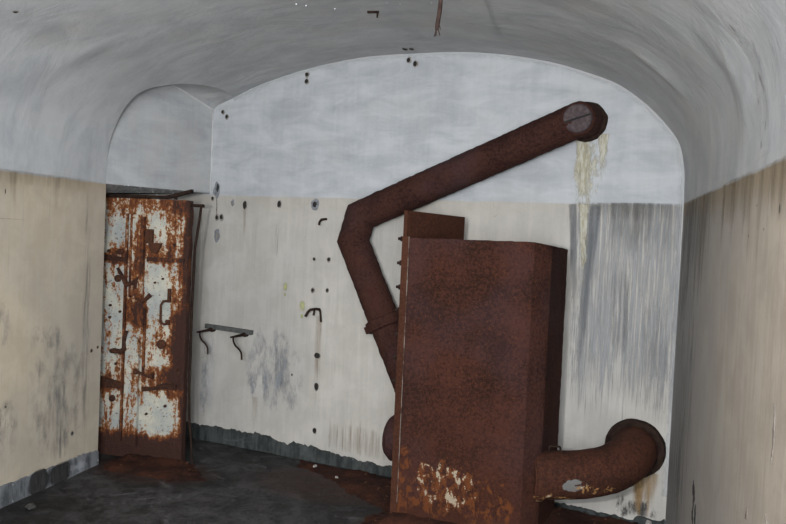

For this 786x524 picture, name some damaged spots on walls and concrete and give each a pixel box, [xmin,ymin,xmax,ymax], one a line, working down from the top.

damp [570,134,682,400]
damp [617,497,653,517]